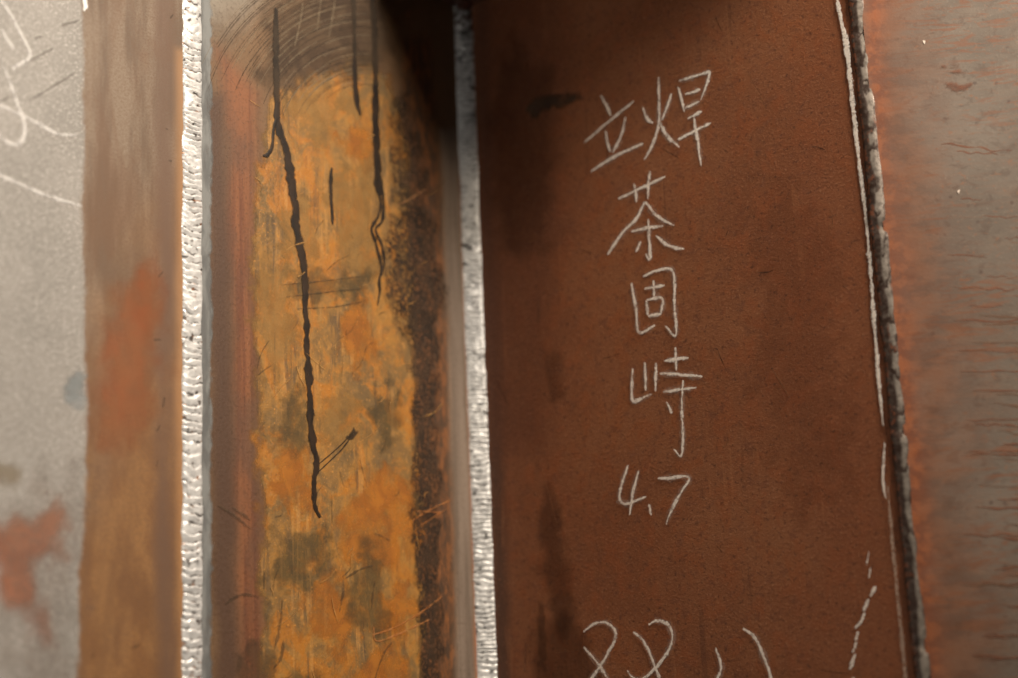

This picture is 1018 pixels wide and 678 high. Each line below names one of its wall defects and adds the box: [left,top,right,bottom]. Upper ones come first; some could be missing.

corrosion [0,510,64,605]
corrosion [250,59,425,678]